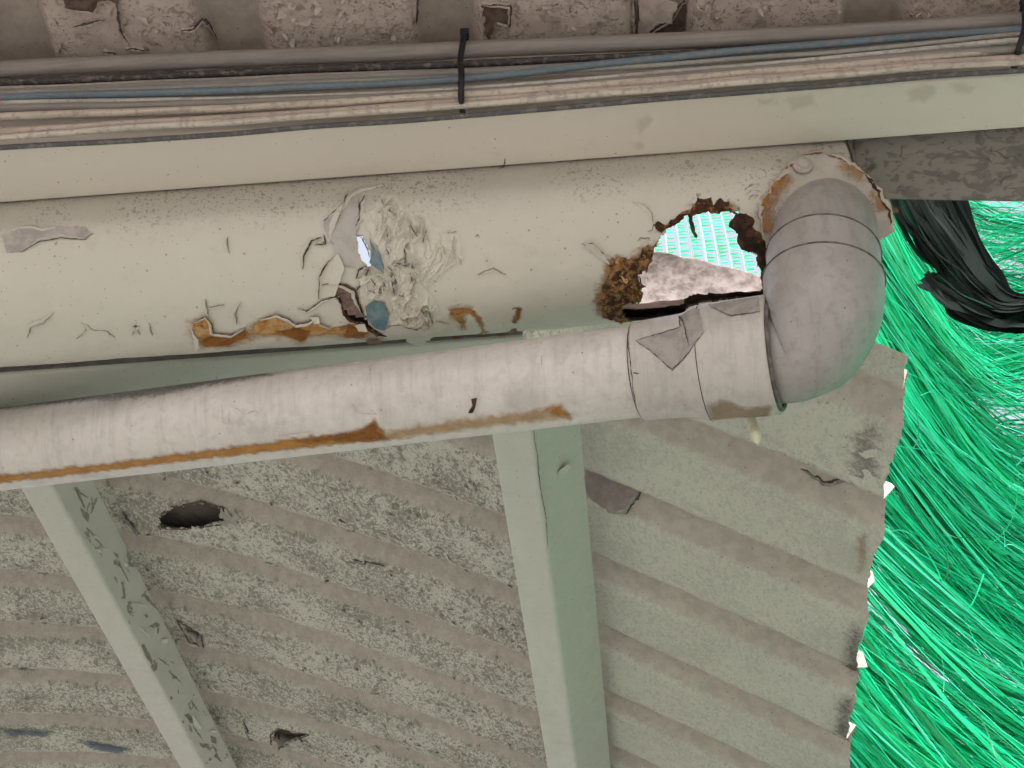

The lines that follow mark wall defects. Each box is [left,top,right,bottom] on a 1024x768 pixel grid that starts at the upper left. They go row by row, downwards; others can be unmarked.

corrosion [757,152,892,236]
peeling [357,192,464,346]
corrosion [594,196,739,323]
corrosion [191,315,384,352]
corrosion [451,307,521,339]
peeling [636,296,760,371]
corrosion [0,407,569,483]
peeling [585,470,641,514]
crack [801,469,849,487]
peeling [74,487,229,764]
peeling [278,737,308,752]